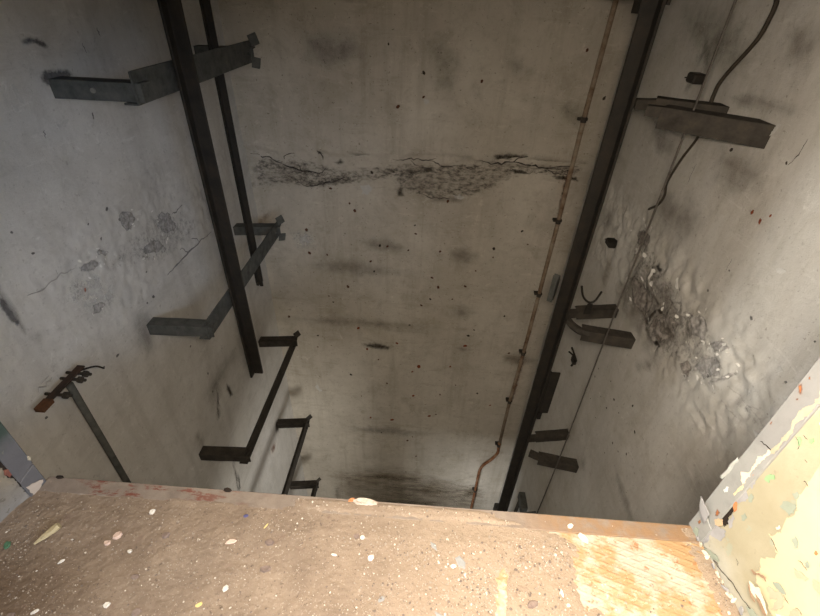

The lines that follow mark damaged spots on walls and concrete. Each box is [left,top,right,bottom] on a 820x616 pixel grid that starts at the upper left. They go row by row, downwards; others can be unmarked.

crack [250,151,348,187]
crack [402,158,460,167]
crack [483,156,578,181]
spalling [119,209,139,230]
spalling [629,218,652,258]
spalling [78,237,108,279]
peeling [748,465,820,616]